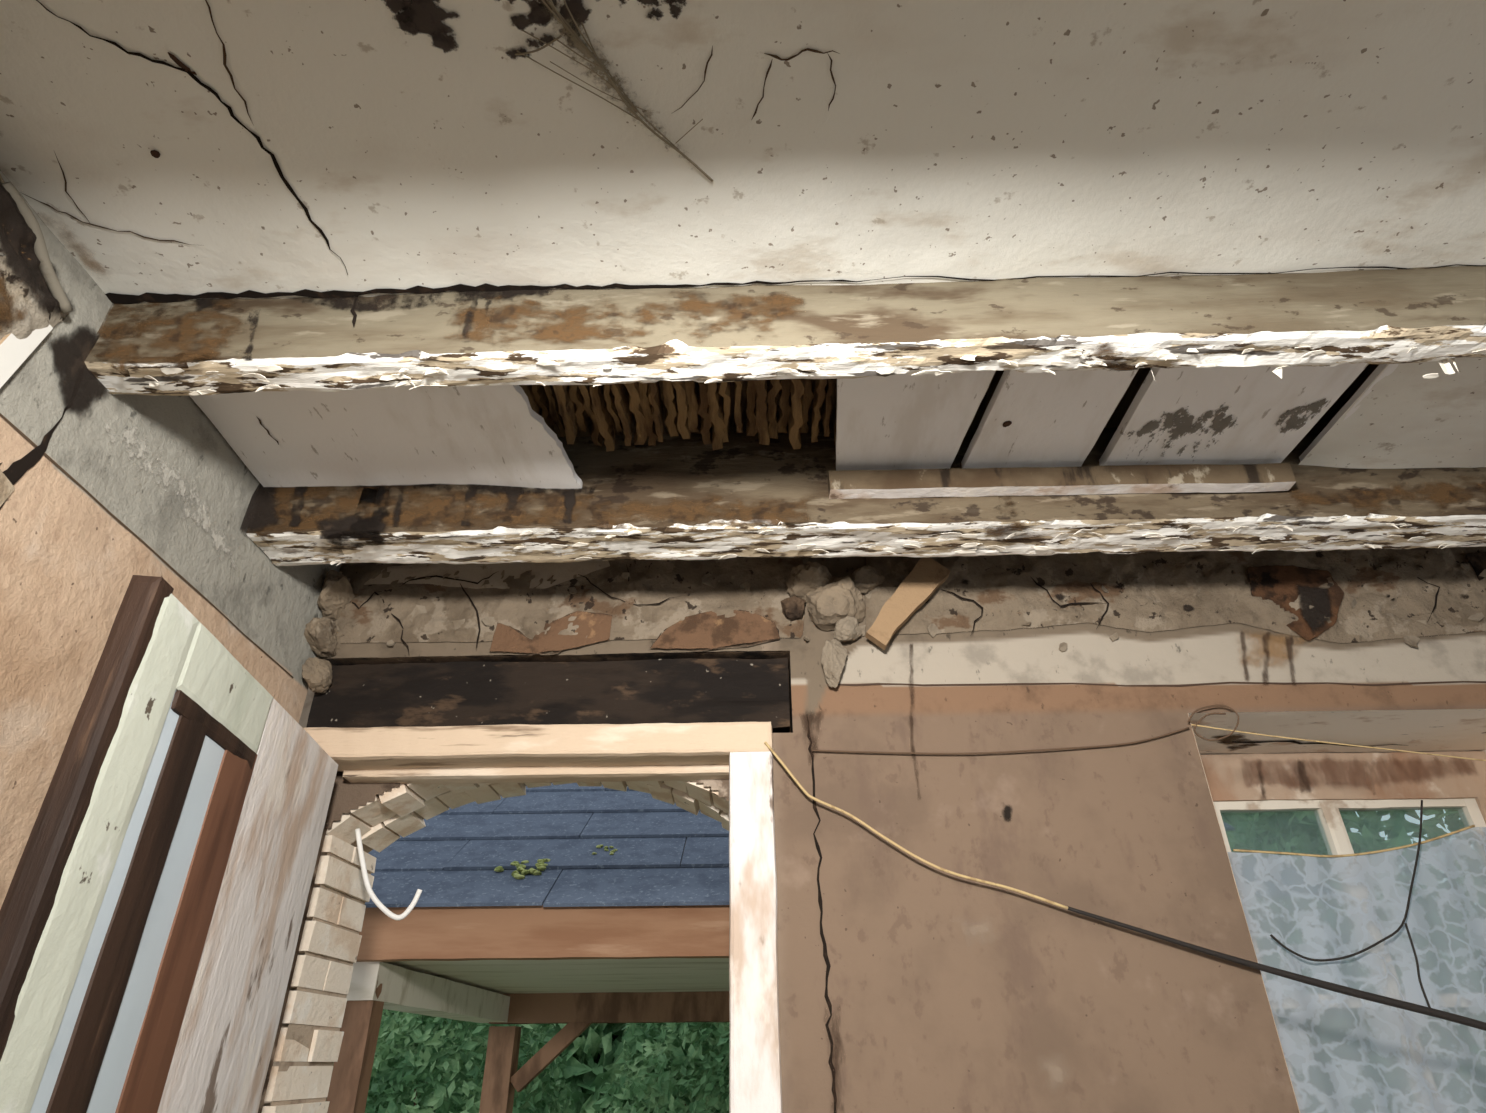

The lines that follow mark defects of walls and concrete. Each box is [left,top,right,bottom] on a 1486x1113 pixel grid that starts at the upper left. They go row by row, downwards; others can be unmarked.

water stain [384,0,459,53]
water stain [498,0,599,59]
water stain [619,0,686,21]
crack [751,48,840,120]
crack [20,0,358,327]
peeling [379,367,449,390]
peeling [1423,349,1486,379]
crack [0,407,67,510]
peeling [1120,405,1237,457]
flaking render [330,530,830,655]
flaking render [858,514,1486,652]
crack [803,713,841,1113]